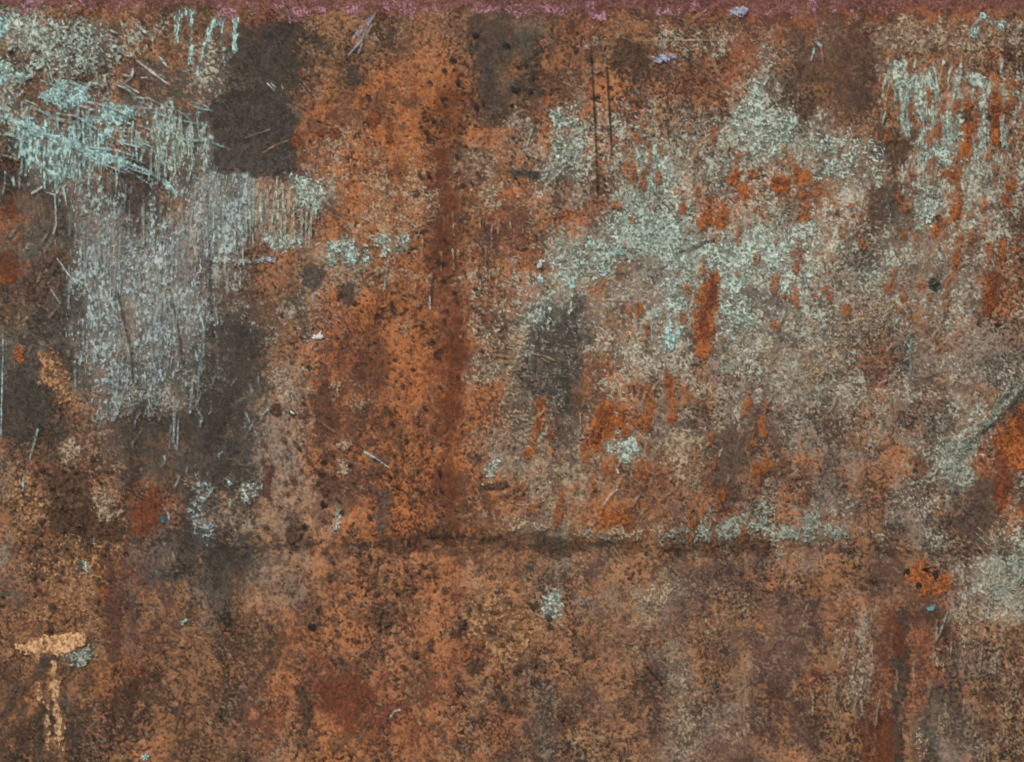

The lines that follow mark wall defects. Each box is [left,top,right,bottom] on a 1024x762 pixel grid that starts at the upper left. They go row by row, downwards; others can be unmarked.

peeling [0,8,328,425]
peeling [498,139,824,445]
rust [612,122,756,245]
rust [675,258,727,369]
peeling [730,70,798,163]
rust [726,142,851,319]
peeling [809,128,886,197]
peeling [877,12,1012,229]
rust [908,70,1020,317]
peeling [603,431,643,463]
rust [580,369,692,479]
rust [990,403,1024,513]